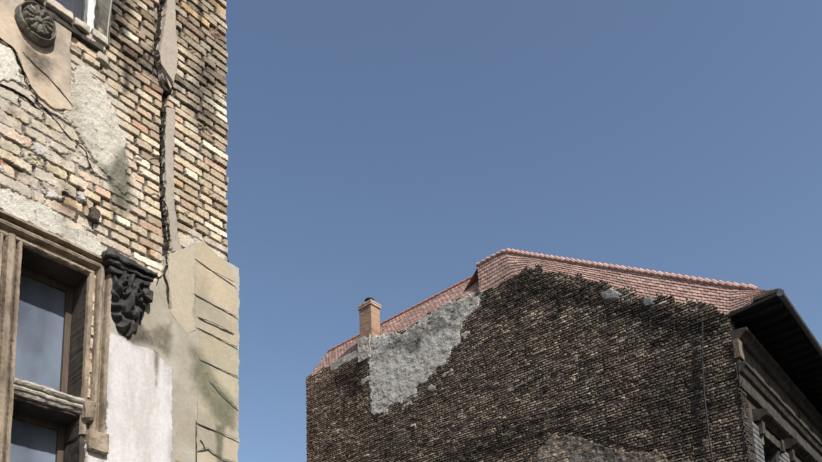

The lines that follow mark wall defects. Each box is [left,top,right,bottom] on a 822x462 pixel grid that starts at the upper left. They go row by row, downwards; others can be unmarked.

flaking render [0,0,72,112]
peeling [40,182,89,204]